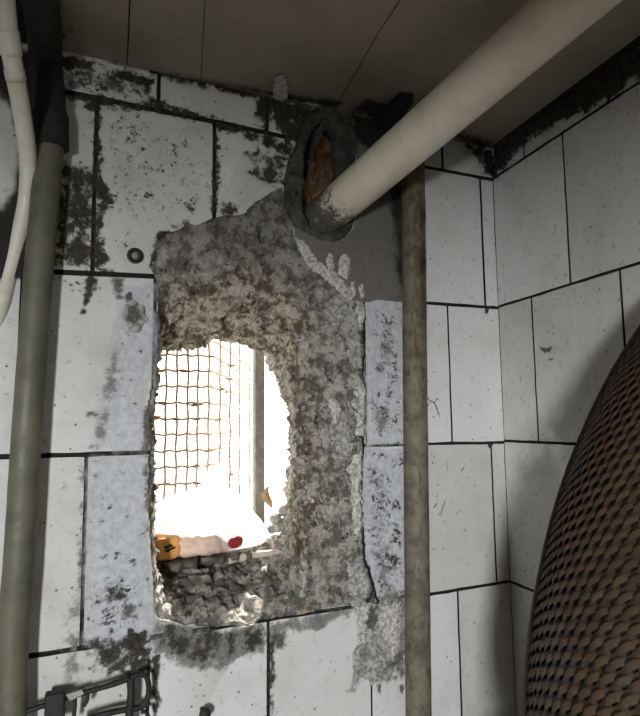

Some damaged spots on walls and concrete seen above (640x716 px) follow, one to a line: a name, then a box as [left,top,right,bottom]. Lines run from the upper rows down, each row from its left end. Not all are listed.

damp [55,56,315,314]
damp [465,36,640,178]
spalling [147,107,377,627]
crack [360,306,368,388]
damp [371,308,403,437]
damp [65,396,405,716]
crack [331,431,379,604]